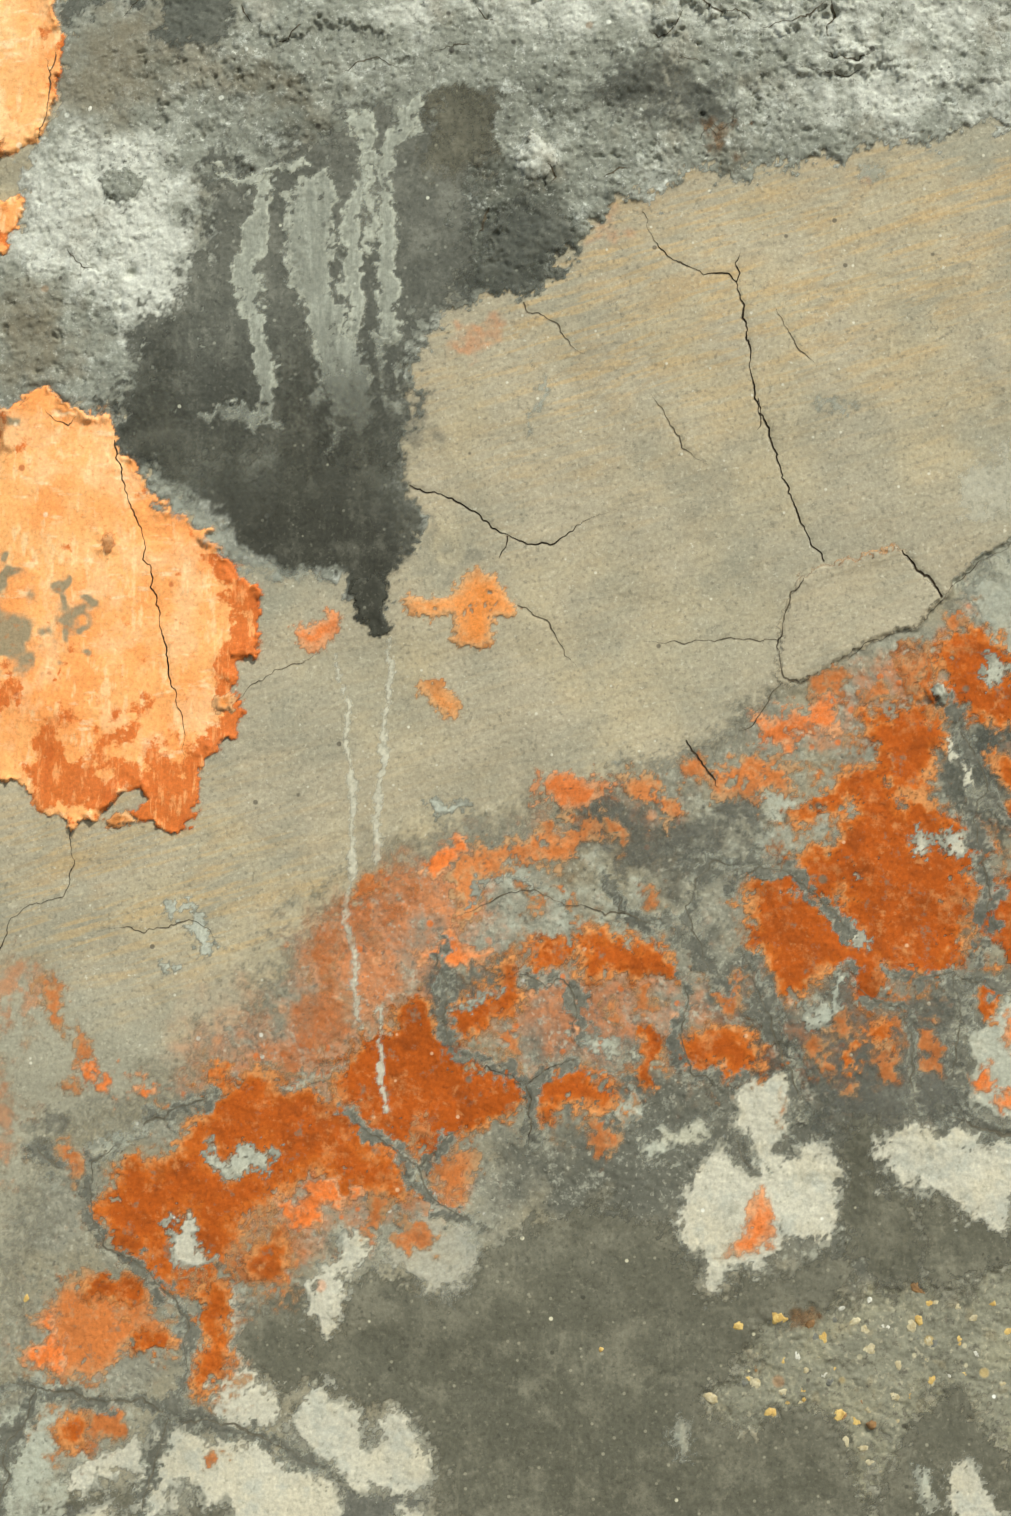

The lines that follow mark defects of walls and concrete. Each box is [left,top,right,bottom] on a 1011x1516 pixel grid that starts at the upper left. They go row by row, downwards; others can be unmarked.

crack [114,440,185,752]
water stain [93,79,581,1113]
flaking render [0,0,1011,834]
crack [409,485,606,557]
crack [517,605,580,672]
crack [523,302,581,353]
crack [643,212,1011,731]
flaking render [0,537,1011,1516]
water stain [235,965,1011,1516]